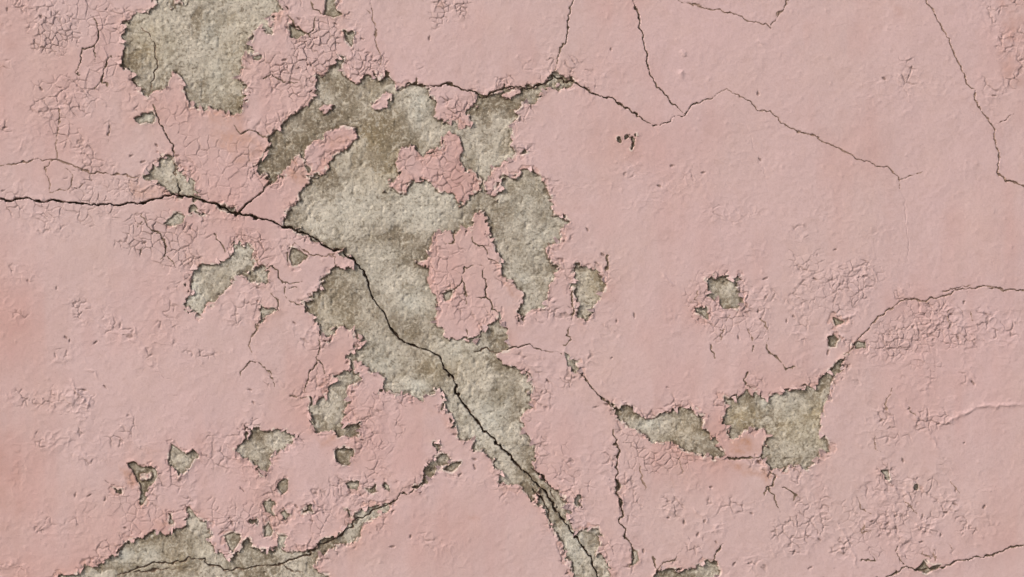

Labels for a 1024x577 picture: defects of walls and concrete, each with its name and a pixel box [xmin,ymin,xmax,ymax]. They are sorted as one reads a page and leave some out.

crack [262,0,922,189]
crack [926,0,1024,187]
peeling [57,0,615,577]
crack [0,0,798,577]
peeling [693,271,745,321]
peeling [610,314,867,472]
crack [679,245,1024,416]
crack [817,493,1023,577]